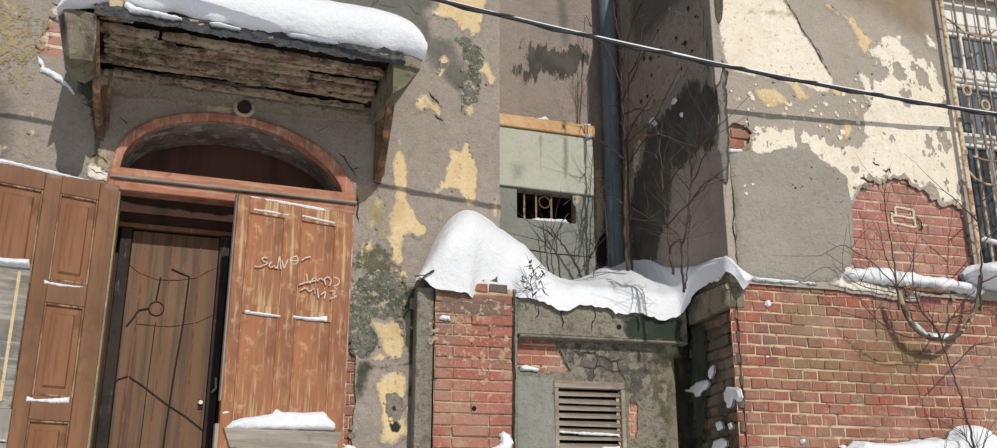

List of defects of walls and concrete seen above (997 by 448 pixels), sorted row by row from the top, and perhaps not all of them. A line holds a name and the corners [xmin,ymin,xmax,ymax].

spalling [34,3,63,56]
peeling [429,0,499,119]
damp [512,40,589,83]
peeling [412,91,445,120]
peeling [431,139,481,208]
damp [630,80,721,261]
spalling [710,0,997,448]
flaking render [344,148,430,448]
spalling [517,339,568,374]